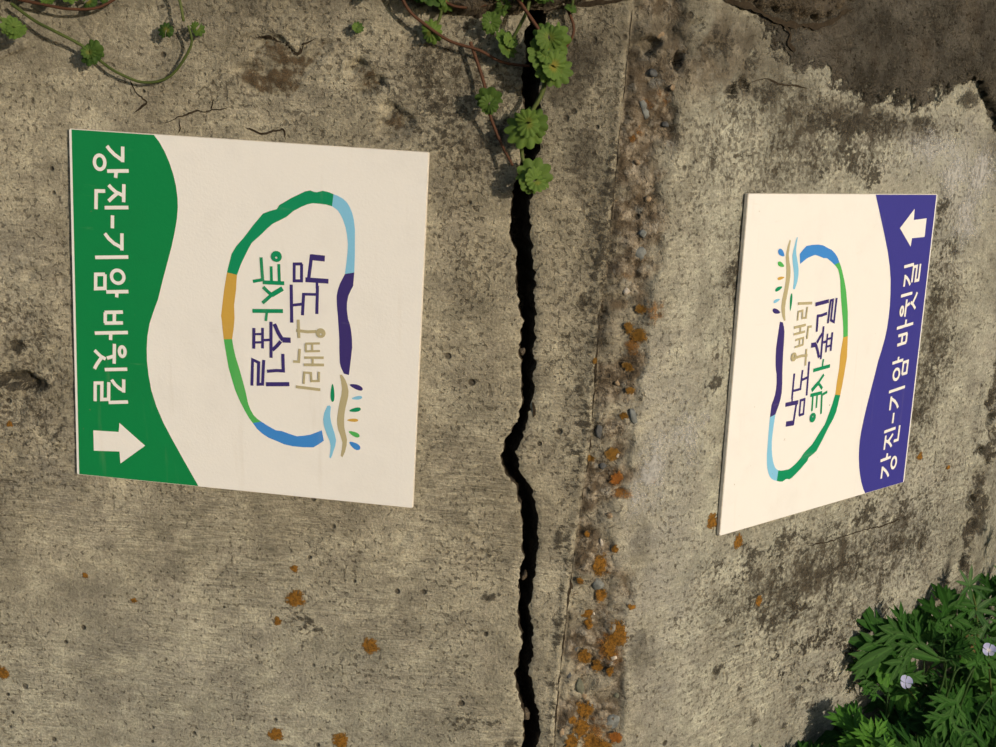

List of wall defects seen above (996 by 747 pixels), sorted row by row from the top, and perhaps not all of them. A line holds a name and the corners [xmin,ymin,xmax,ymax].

crack [724,0,855,52]
crack [750,78,807,89]
crack [500,0,623,747]